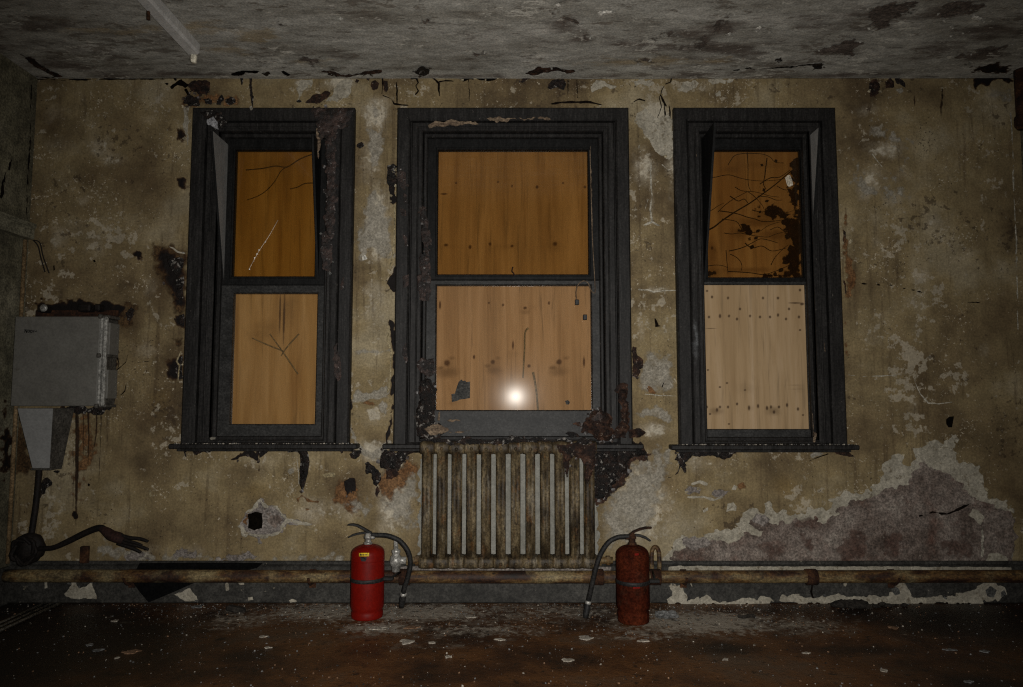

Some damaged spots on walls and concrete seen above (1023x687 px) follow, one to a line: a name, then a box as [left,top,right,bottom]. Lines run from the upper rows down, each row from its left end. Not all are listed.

peeling [412,66,432,78]
peeling [519,66,575,90]
spalling [634,109,673,160]
water stain [133,244,187,328]
spalling [662,416,1019,570]
spalling [238,498,312,545]
peeling [667,583,1007,604]